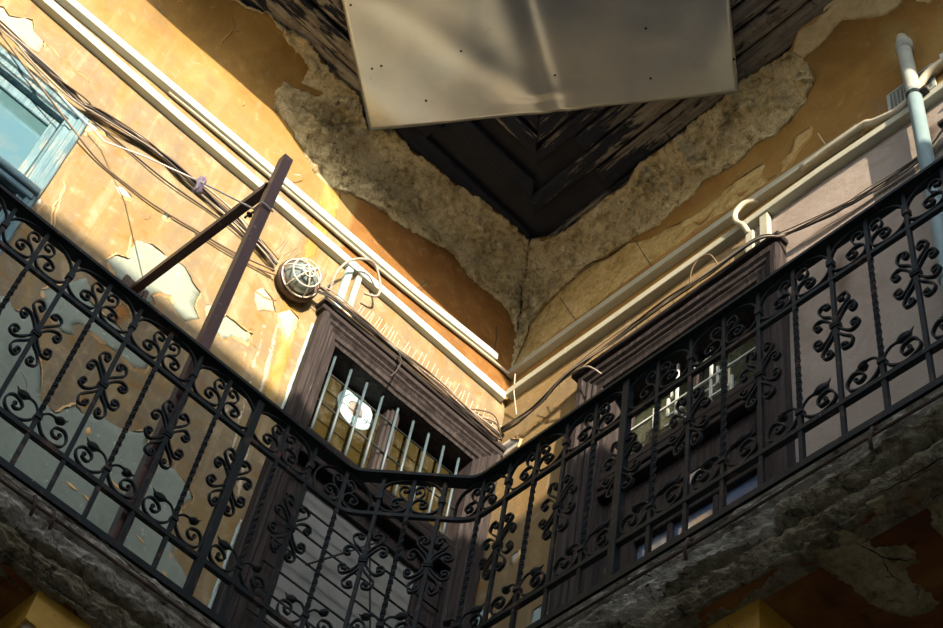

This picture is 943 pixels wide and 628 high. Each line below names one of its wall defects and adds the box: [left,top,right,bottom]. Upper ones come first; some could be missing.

peeling [0,6,46,53]
spalling [235,0,932,367]
peeling [41,278,149,374]
peeling [106,240,212,321]
peeling [217,314,254,347]
peeling [255,288,314,409]
peeling [0,296,149,533]
peeling [502,438,522,458]
spalling [0,464,210,628]
peeling [208,519,242,609]
spalling [550,392,943,628]
peeling [531,604,542,624]